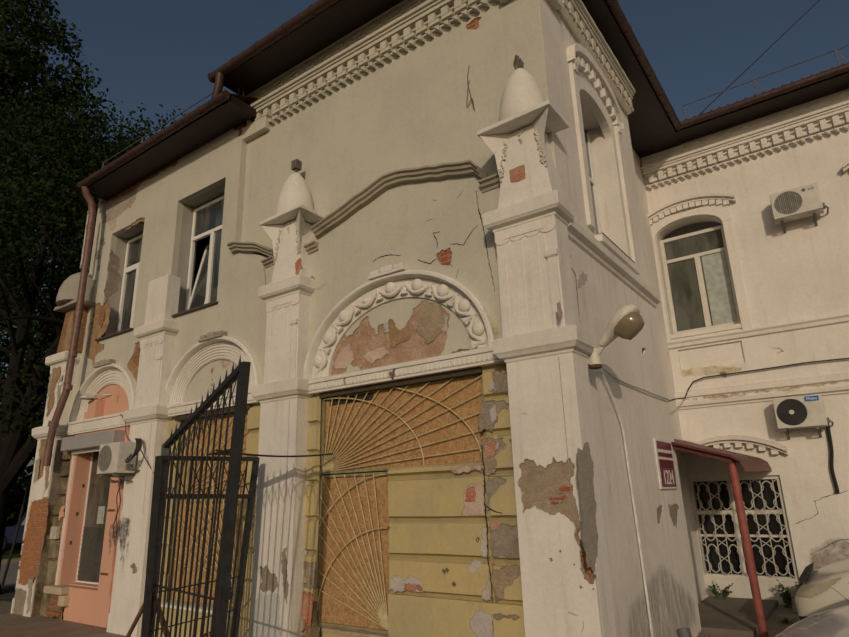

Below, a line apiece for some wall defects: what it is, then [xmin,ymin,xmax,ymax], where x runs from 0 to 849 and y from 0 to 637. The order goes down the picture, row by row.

spalling [100,161,177,224]
crack [373,191,495,291]
spalling [87,239,121,366]
spalling [128,343,140,381]
spalling [331,300,470,375]
spalling [450,369,512,516]
spalling [10,439,52,615]
peeling [250,548,289,637]
peeling [389,575,424,592]
spalling [466,520,521,602]
peeling [470,610,520,637]
spalling [518,442,598,590]